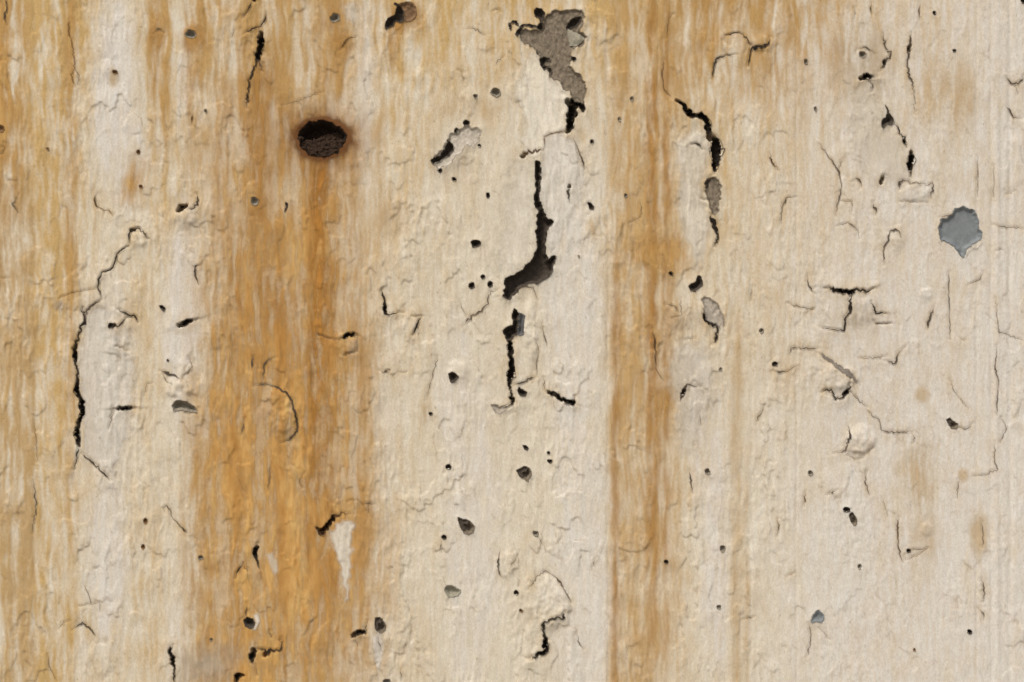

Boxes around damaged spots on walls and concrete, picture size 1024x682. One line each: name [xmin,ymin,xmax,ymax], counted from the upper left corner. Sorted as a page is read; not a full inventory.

rust [0,0,18,184]
crack [68,228,147,479]
rust [195,71,371,682]
spalling [430,126,482,168]
crack [461,97,585,408]
spalling [497,8,586,275]
rust [614,115,680,440]
crack [661,61,725,244]
peeling [678,133,722,263]
crack [775,280,915,440]
peeling [938,206,983,257]
crack [531,570,581,659]